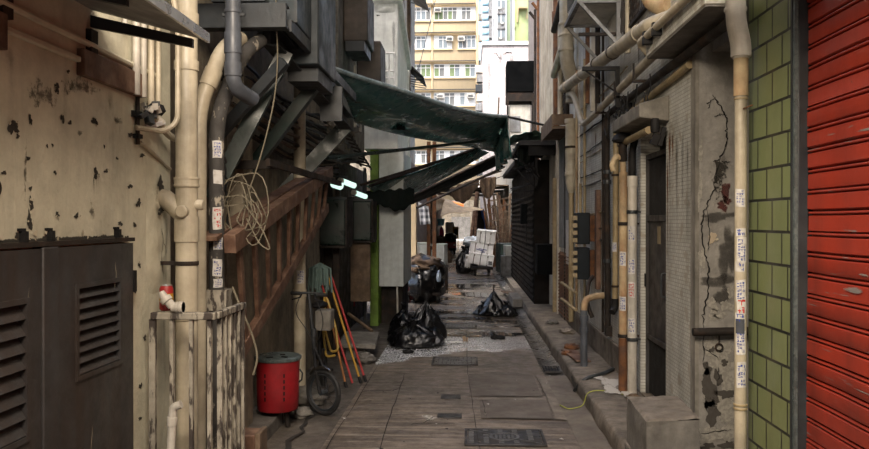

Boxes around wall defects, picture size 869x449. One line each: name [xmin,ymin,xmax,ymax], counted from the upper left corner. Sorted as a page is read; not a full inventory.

spalling [7,118,20,139]
peeling [0,186,137,243]
peeling [156,174,165,217]
crack [700,94,730,381]